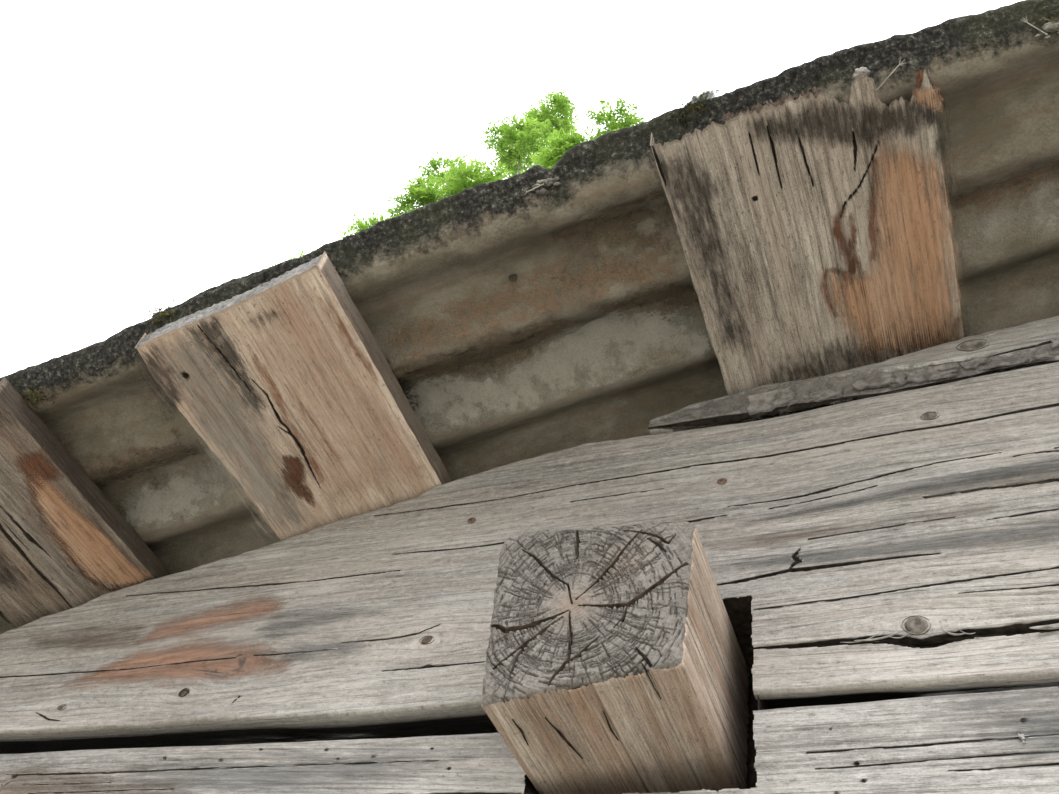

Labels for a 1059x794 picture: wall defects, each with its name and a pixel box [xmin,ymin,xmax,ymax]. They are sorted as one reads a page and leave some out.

crack [840,128,879,218]
leakage [748,88,1059,383]
peeling [888,339,1059,388]
crack [197,325,320,487]
crack [374,338,1059,516]
crack [0,447,1059,686]
crack [636,648,661,699]
crack [512,718,529,745]
crack [545,717,583,759]
crack [603,710,619,741]
crack [6,760,439,794]
crack [432,786,521,794]